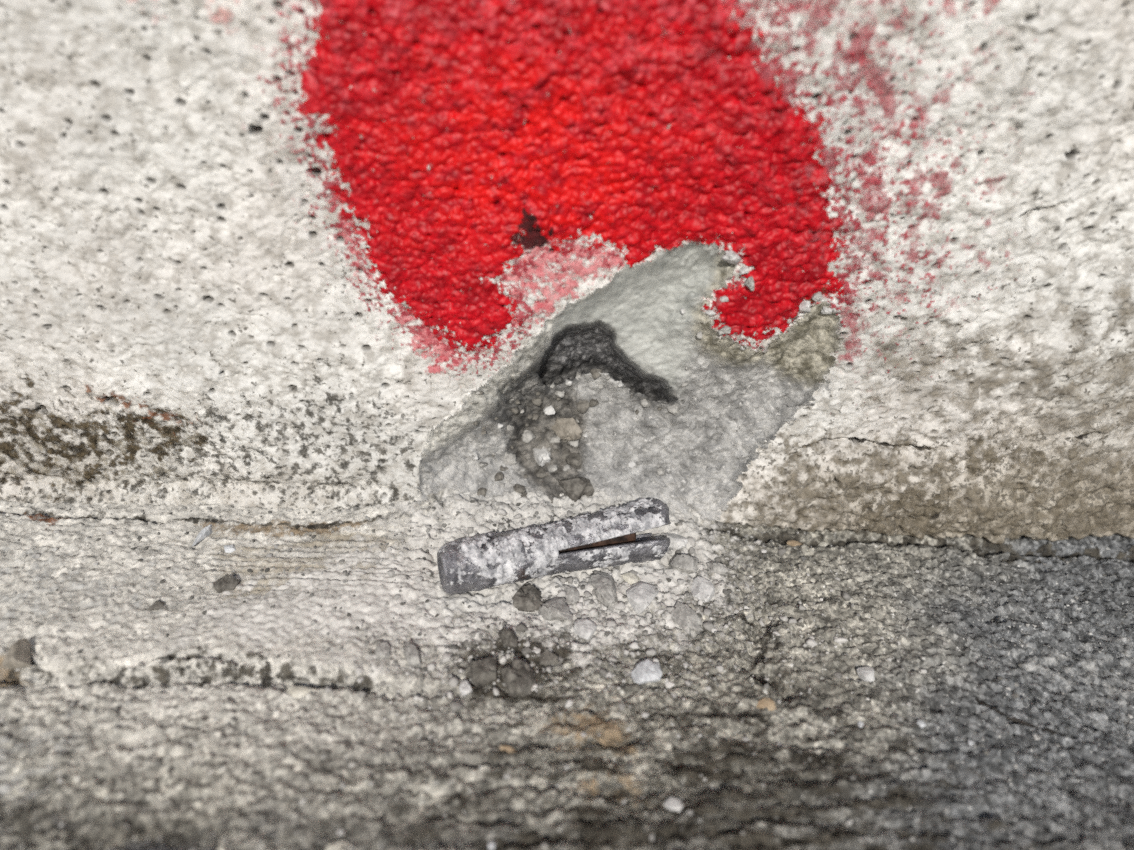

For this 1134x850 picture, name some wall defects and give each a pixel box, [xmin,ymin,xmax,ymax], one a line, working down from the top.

spalling [417,242,845,521]
crack [800,437,931,451]
crack [705,509,1134,563]